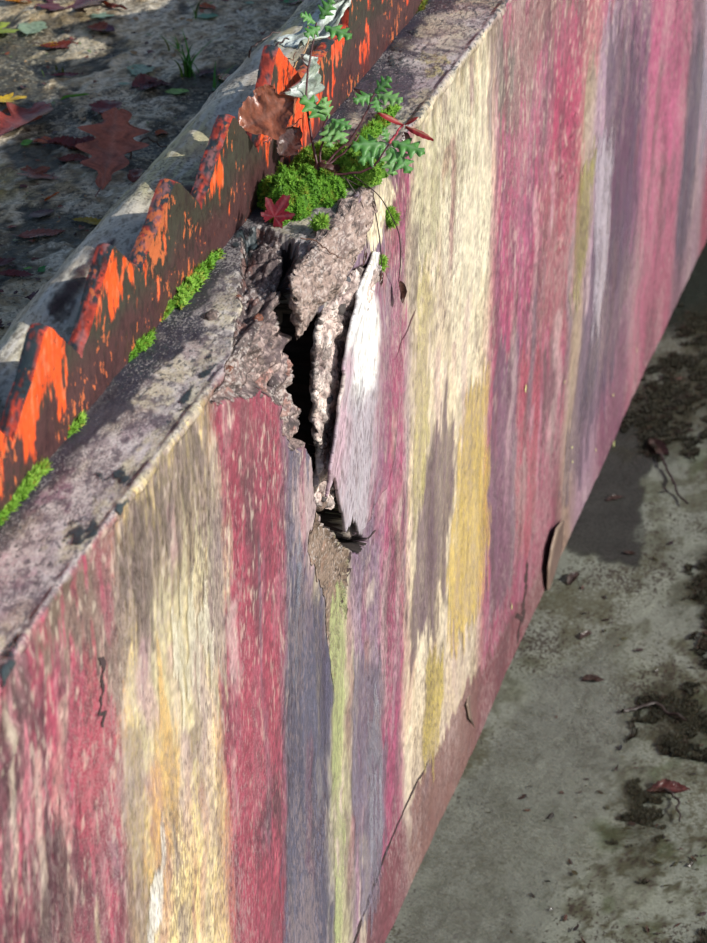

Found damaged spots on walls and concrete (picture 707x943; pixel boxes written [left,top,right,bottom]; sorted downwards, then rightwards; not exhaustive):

peeling [176,388,192,411]
crack [273,243,318,478]
flaking render [199,226,400,535]
peeling [0,634,18,688]
crack [308,497,376,692]
rust [423,361,490,766]